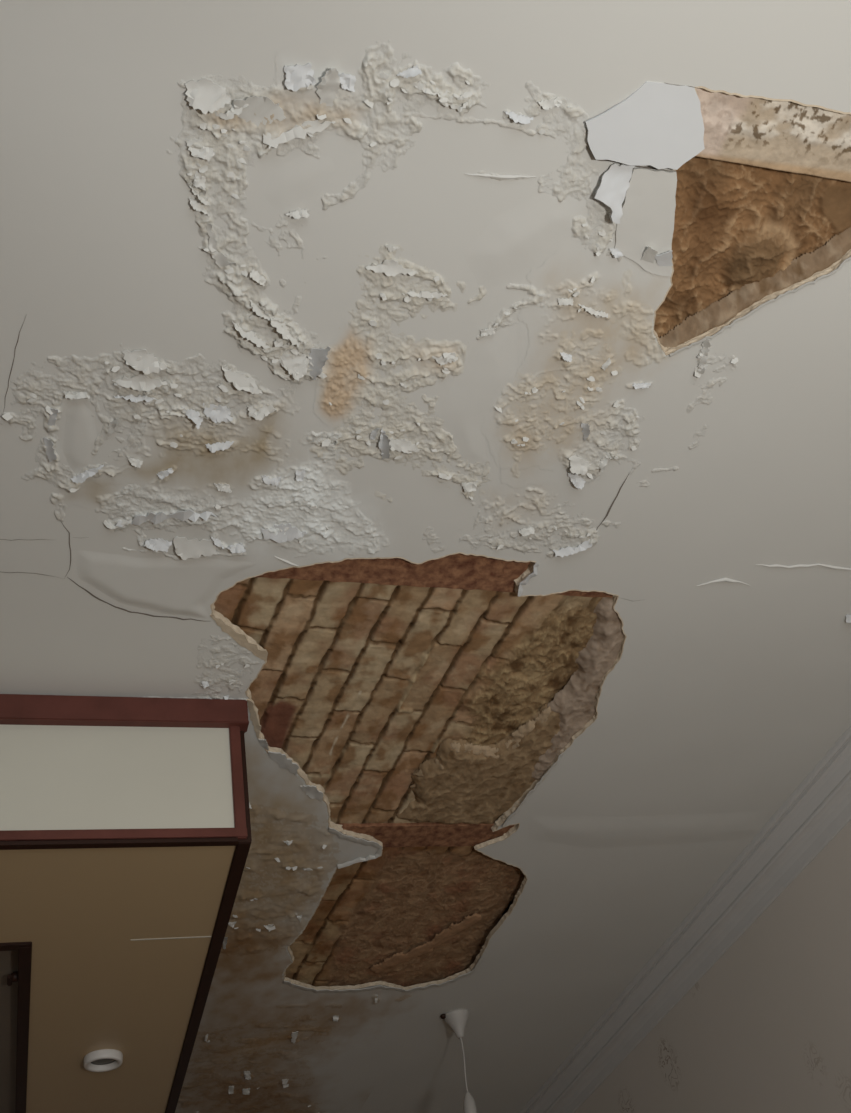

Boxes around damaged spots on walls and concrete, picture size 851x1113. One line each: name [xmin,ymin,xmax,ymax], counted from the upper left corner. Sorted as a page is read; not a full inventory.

peeling [0,40,624,522]
flaking render [641,156,851,413]
crack [0,522,202,621]
peeling [95,468,246,560]
flaking render [143,244,679,1003]
peeling [228,1071,259,1095]